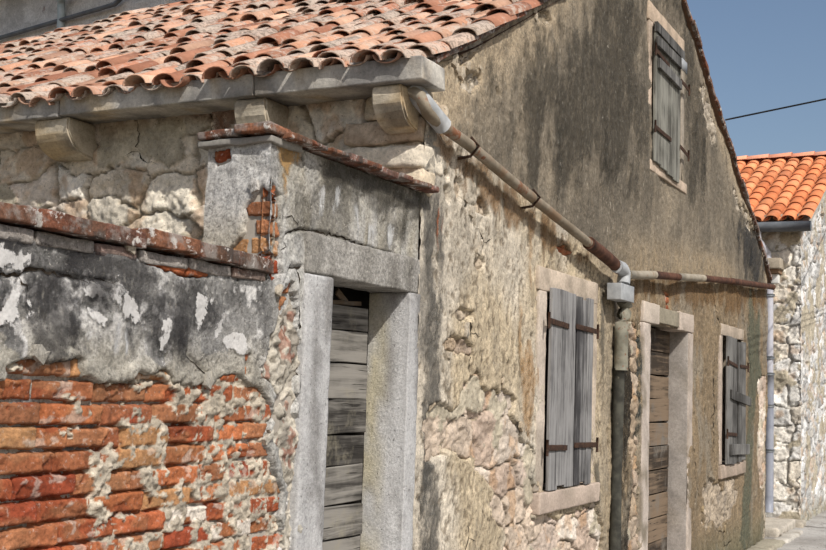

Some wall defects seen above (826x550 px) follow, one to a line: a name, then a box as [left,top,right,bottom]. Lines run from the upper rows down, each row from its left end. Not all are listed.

damp [520,0,649,194]
rust [439,133,592,262]
flaking render [0,177,303,550]
damp [420,192,444,421]
damp [419,451,441,550]